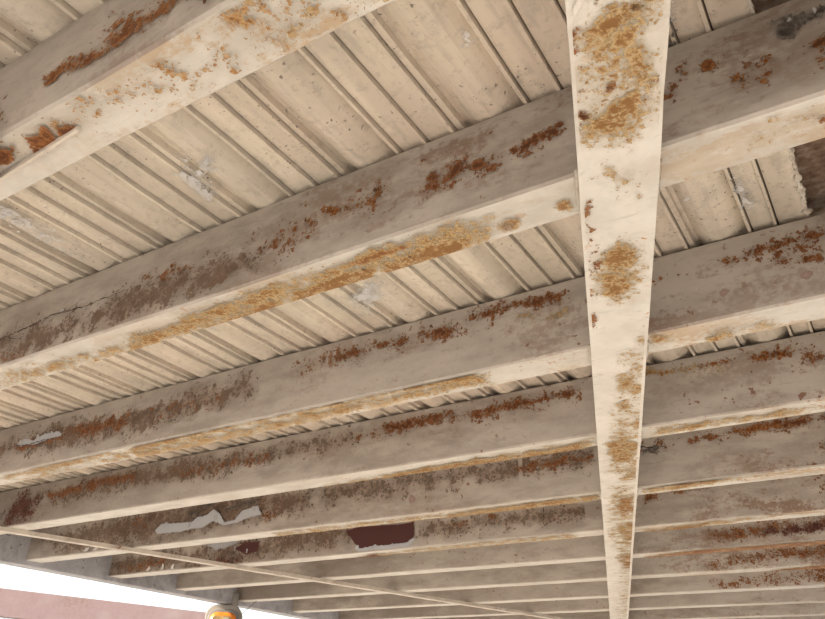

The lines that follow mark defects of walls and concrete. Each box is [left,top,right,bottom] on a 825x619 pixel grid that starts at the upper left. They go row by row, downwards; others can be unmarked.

rust [42,0,188,86]
rust [13,43,242,153]
rust [572,0,688,151]
rust [0,179,522,389]
rust [418,120,566,203]
rust [554,200,574,212]
rust [584,200,663,305]
rust [291,289,570,383]
peeling [15,431,61,447]
peeling [155,499,263,534]
peeling [346,522,416,551]
rust [0,324,825,617]